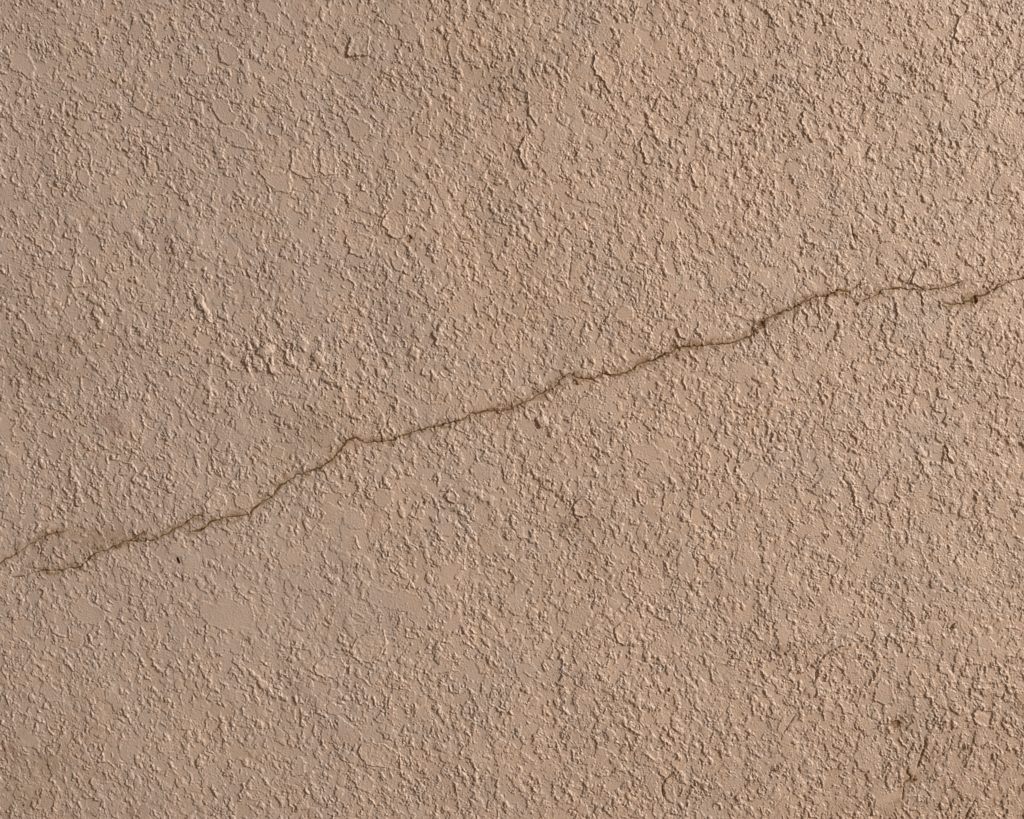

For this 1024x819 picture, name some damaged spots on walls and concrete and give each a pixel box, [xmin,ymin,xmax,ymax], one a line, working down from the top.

crack [0,268,1024,577]